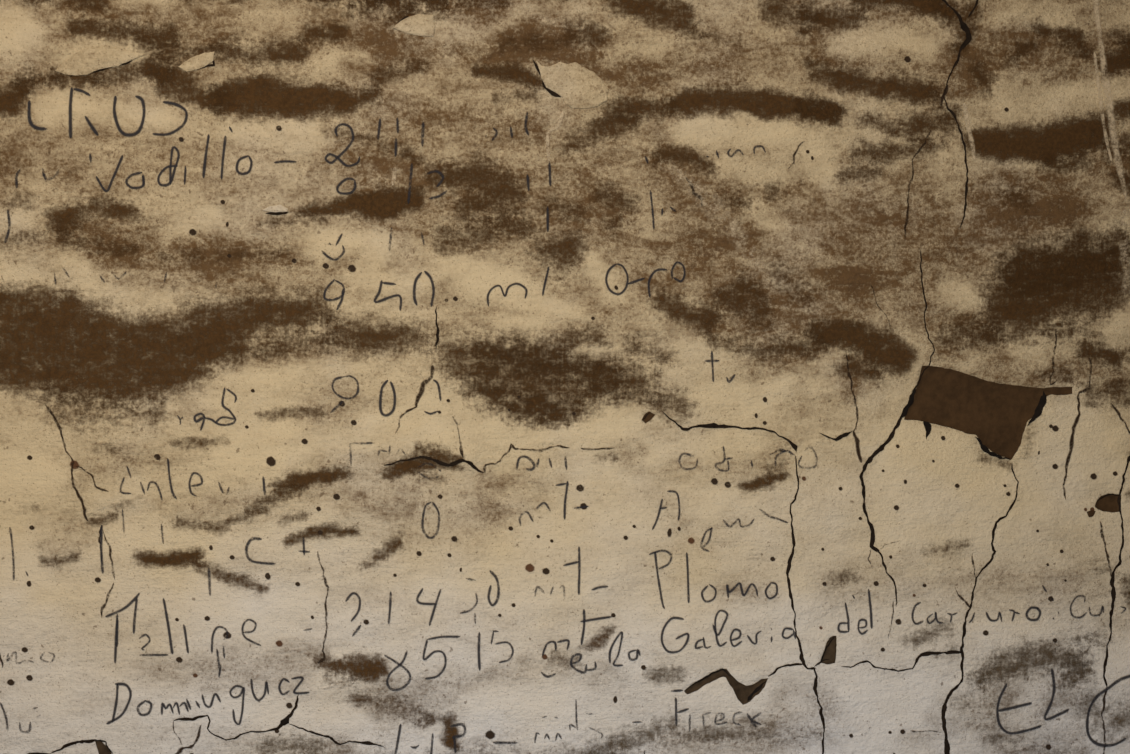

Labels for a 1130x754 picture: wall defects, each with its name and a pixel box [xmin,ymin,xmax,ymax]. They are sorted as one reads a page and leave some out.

crack [396,307,439,432]
crack [662,0,1019,754]
flaking render [901,366,1072,460]
crack [384,417,612,473]
flaking render [1087,493,1120,517]
crack [1049,333,1130,754]
flaking render [684,668,768,704]
crack [50,739,97,754]
flaking render [94,740,113,754]
crack [173,696,383,754]